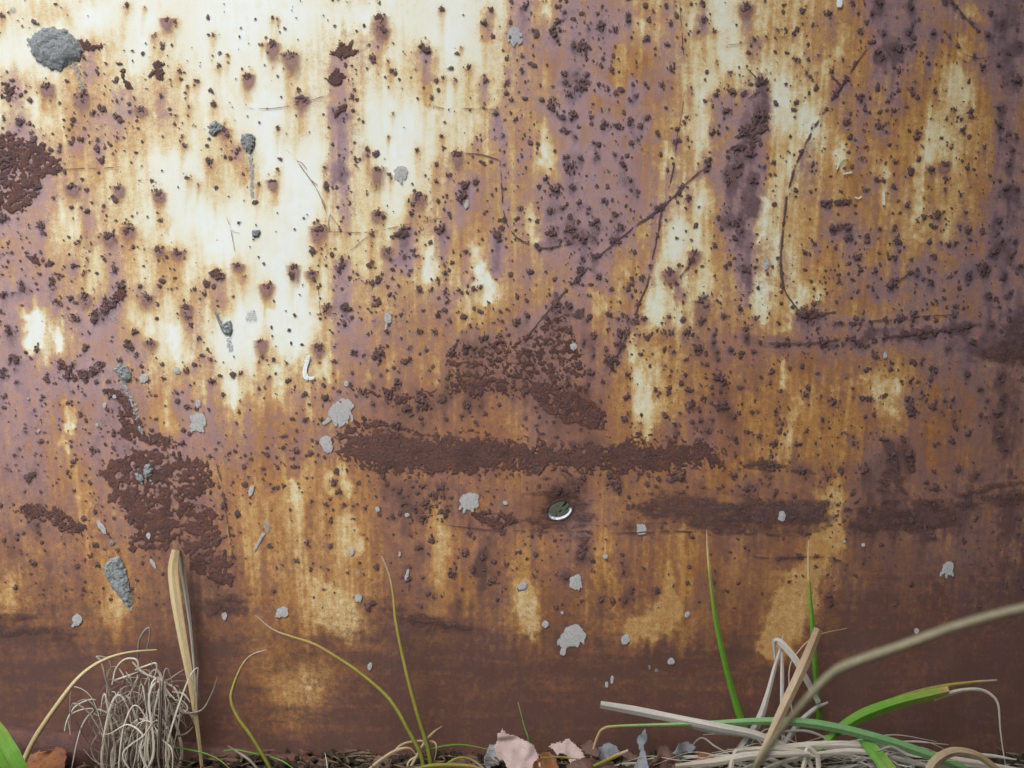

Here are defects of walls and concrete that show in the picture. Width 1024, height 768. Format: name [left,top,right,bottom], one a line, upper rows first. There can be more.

corrosion [2,531,52,607]